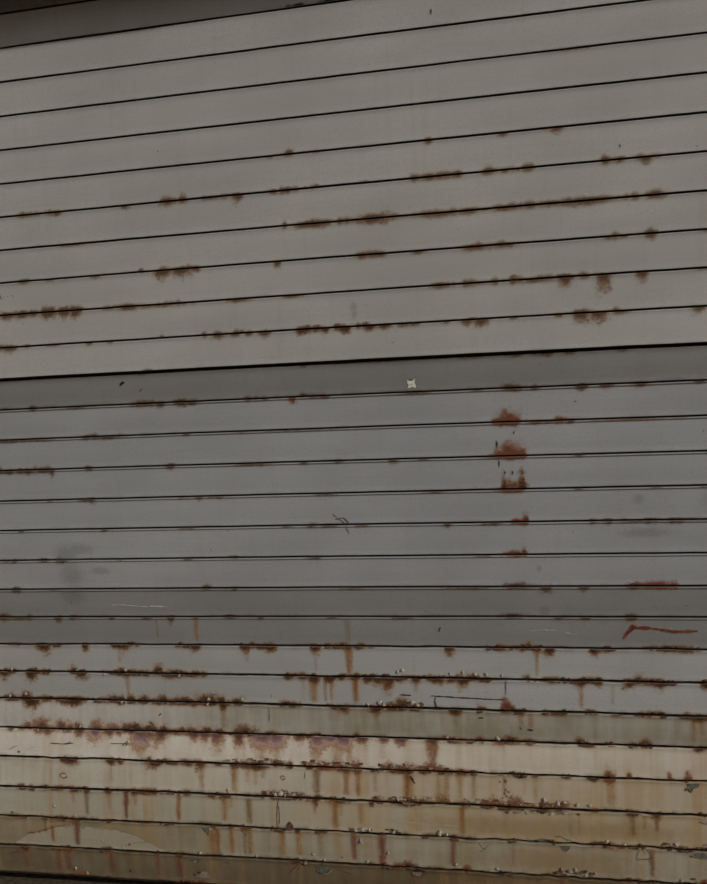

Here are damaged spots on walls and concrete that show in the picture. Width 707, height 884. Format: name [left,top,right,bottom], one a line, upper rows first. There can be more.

rust [283,196,612,228]
rust [155,265,200,279]
rust [509,272,610,289]
rust [0,306,83,319]
rust [296,322,420,337]
rust [484,410,574,493]
rust [486,642,556,660]
rust [0,667,51,680]
rust [109,666,207,679]
rust [284,642,493,714]
rust [523,675,604,700]
rust [622,676,677,689]